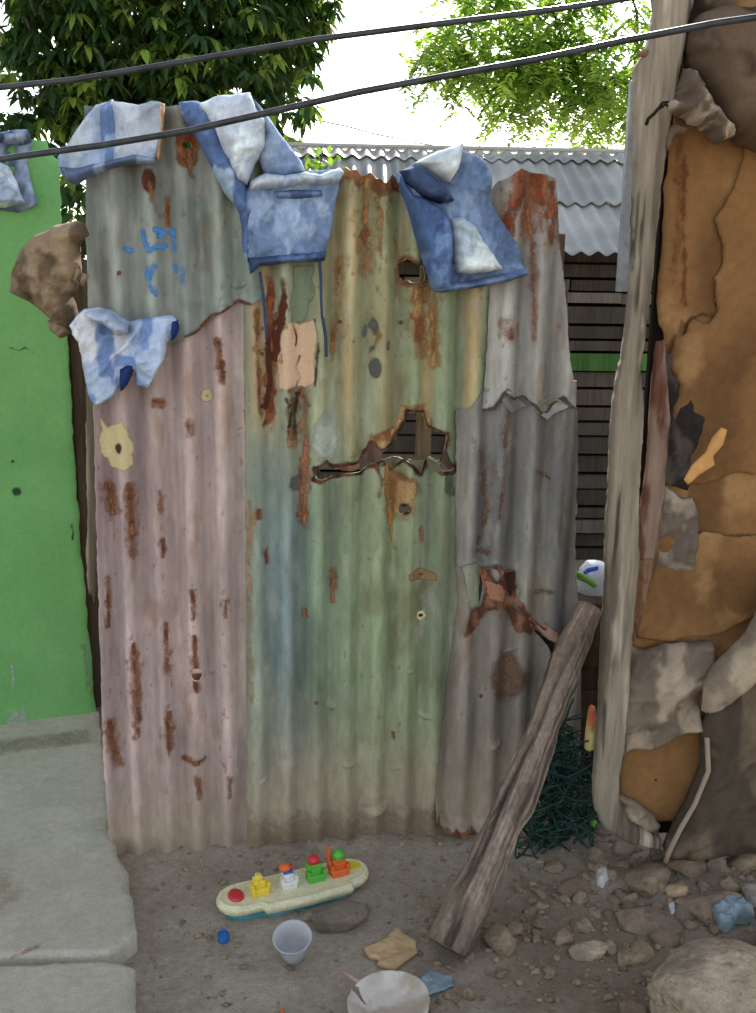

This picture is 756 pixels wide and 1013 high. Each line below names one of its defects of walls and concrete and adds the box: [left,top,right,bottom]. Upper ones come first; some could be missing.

corrosion [176,133,199,178]
corrosion [339,168,399,277]
corrosion [500,169,558,340]
corrosion [394,253,443,366]
corrosion [184,277,311,524]
corrosion [370,404,450,448]
corrosion [104,481,139,559]
corrosion [484,571,515,603]
corrosion [130,643,142,740]
corrosion [164,623,172,671]
corrosion [190,635,200,693]
corrosion [164,711,176,752]